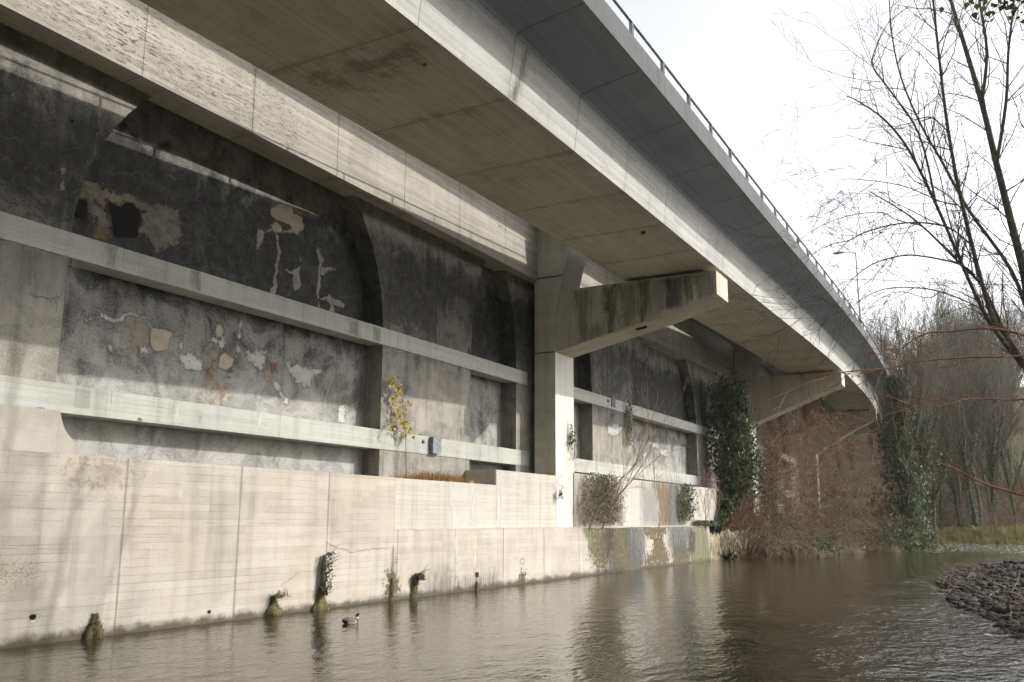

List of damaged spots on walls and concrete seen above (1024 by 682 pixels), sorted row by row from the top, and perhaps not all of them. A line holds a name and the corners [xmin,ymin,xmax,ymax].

peeling [75,179,184,255]
peeling [255,201,311,295]
water stain [591,273,714,338]
peeling [107,318,270,372]
peeling [282,360,323,389]
water stain [584,527,646,575]
water stain [668,526,709,565]